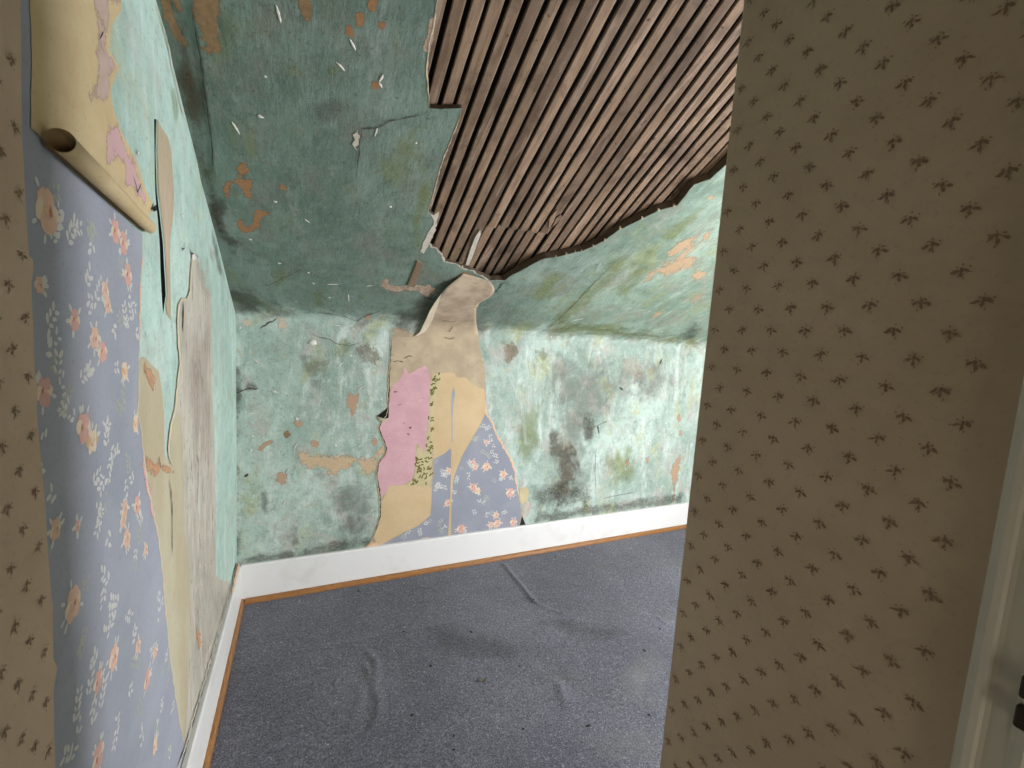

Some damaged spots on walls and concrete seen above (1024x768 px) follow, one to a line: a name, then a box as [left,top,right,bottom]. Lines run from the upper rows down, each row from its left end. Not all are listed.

peeling [423,0,438,97]
peeling [223,162,287,240]
spalling [420,112,716,281]
peeling [381,278,436,297]
peeling [644,231,710,303]
spalling [375,399,389,422]
flaking render [138,257,230,746]
peeling [297,438,386,476]
leakage [537,434,580,501]